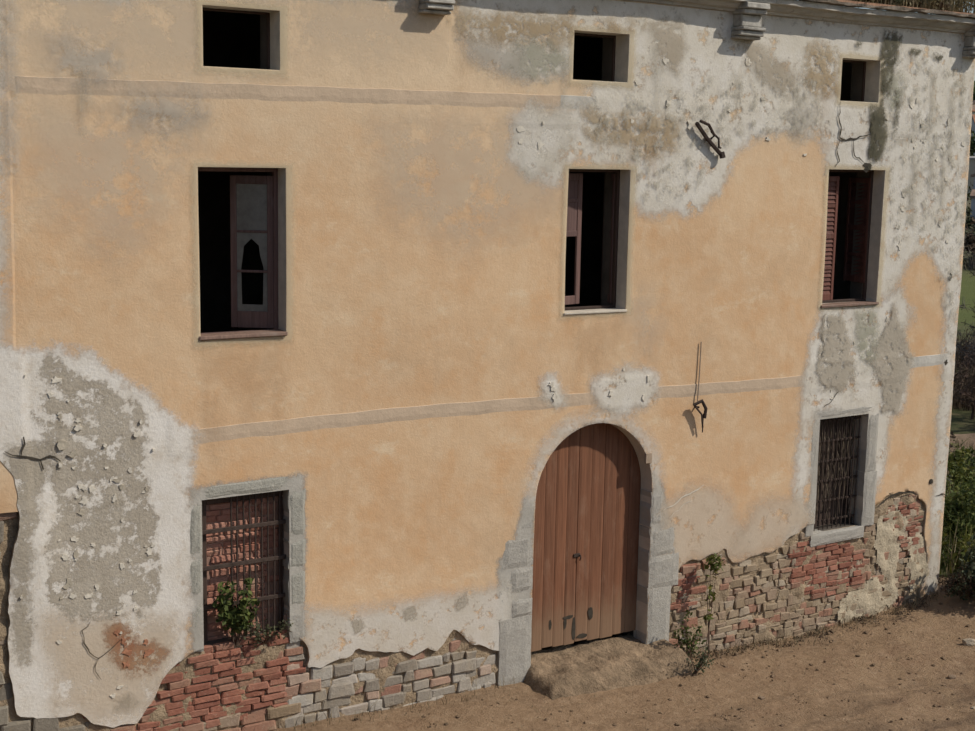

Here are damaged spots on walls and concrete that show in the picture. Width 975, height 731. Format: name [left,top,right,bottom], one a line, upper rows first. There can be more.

crack [835,102,871,167]
peeling [457,0,975,656]
crack [6,437,61,470]
peeling [0,285,514,731]
crack [81,621,120,679]
corrosion [104,623,169,674]